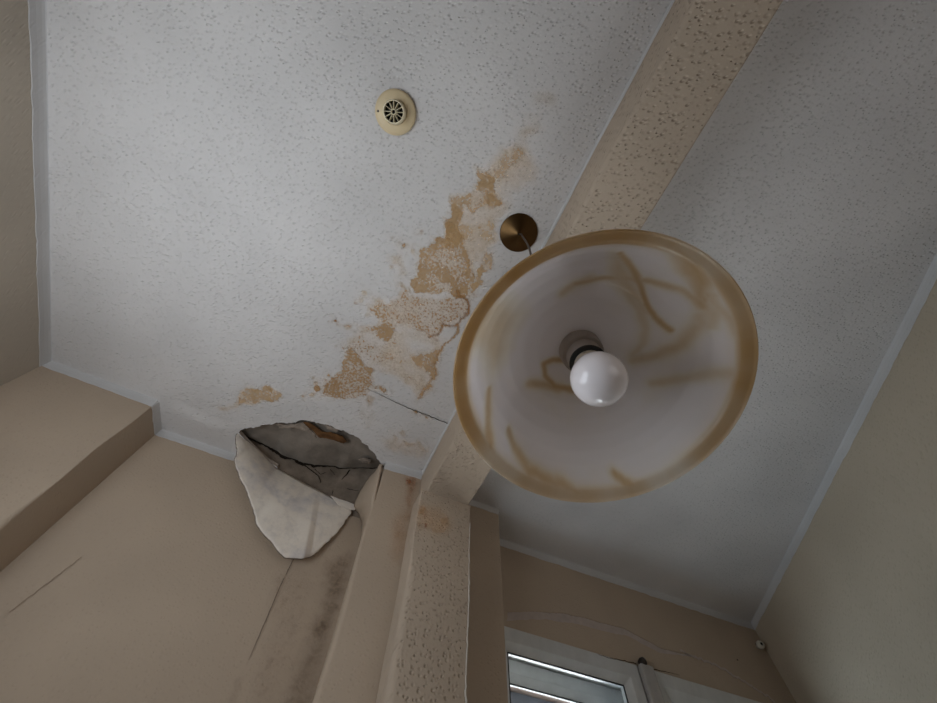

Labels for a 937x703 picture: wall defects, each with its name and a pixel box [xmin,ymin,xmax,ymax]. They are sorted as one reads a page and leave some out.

water stain [314,149,523,402]
water stain [239,386,281,404]
flaking render [249,439,383,518]